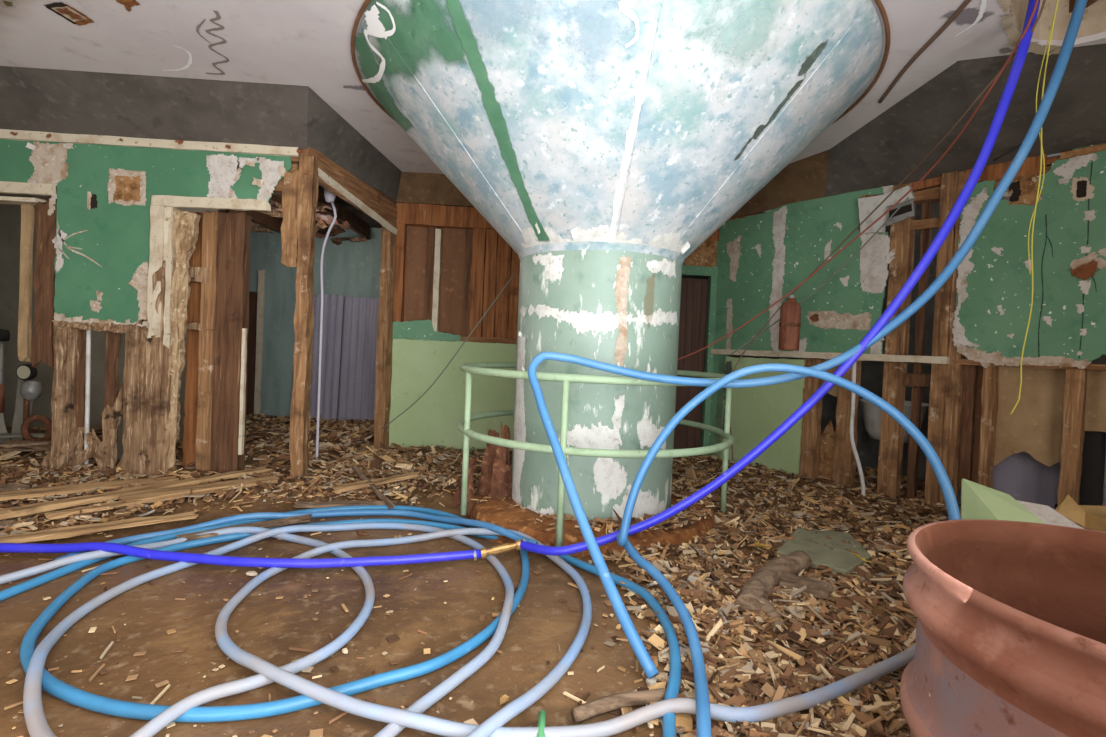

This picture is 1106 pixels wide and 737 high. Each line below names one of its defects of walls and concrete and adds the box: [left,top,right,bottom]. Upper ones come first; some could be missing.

peeling [25,142,74,216]
peeling [206,154,286,201]
peeling [1004,145,1098,202]
peeling [52,228,67,272]
peeling [125,261,149,328]
peeling [520,223,690,367]
peeling [755,206,807,352]
peeling [840,233,895,294]
peeling [952,187,989,351]
corrosion [1070,252,1106,279]
peeling [512,331,554,516]
peeling [558,394,666,521]